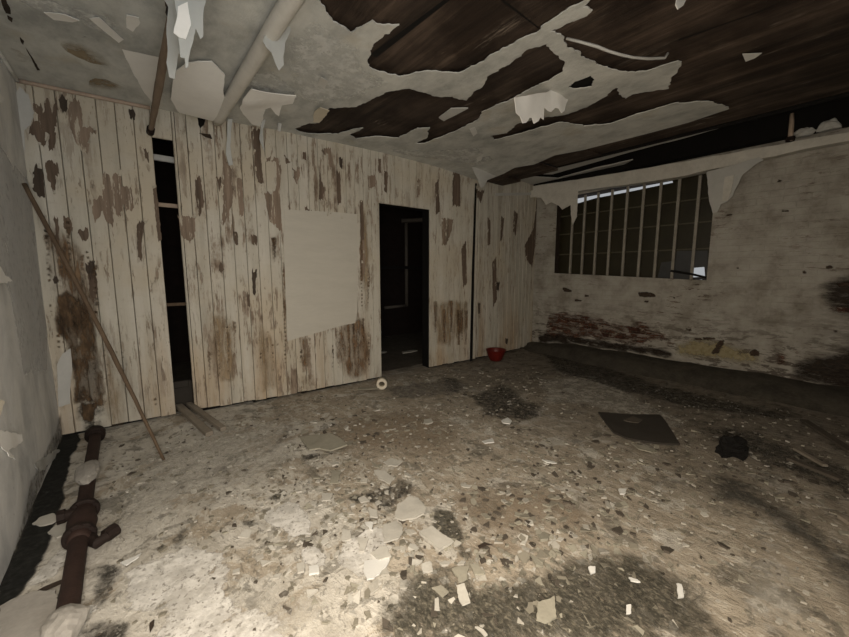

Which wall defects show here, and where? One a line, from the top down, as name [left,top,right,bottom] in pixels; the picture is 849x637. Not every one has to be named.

peeling [89,0,206,102]
peeling [298,0,849,142]
peeling [319,147,343,205]
peeling [487,210,518,245]
peeling [525,184,579,267]
peeling [706,157,764,216]
damp [0,292,118,606]